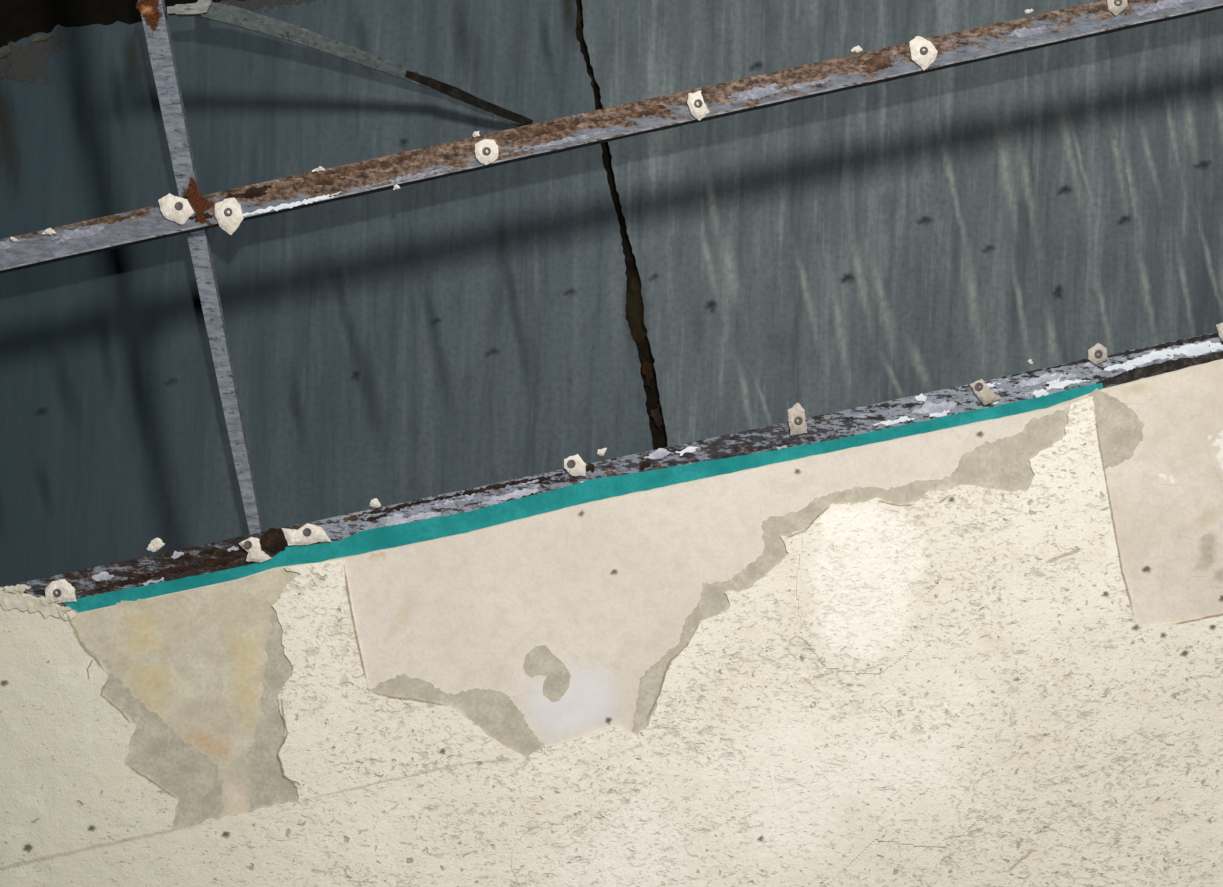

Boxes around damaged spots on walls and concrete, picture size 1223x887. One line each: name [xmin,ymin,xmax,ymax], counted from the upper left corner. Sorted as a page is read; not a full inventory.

rust [136,0,162,30]
rust [184,175,214,225]
rust [625,293,646,344]
rust [642,359,653,388]
rust [1002,359,1089,378]
rust [1096,332,1223,387]
rust [361,550,392,565]
peeling [343,341,1223,758]
peeling [0,546,301,828]